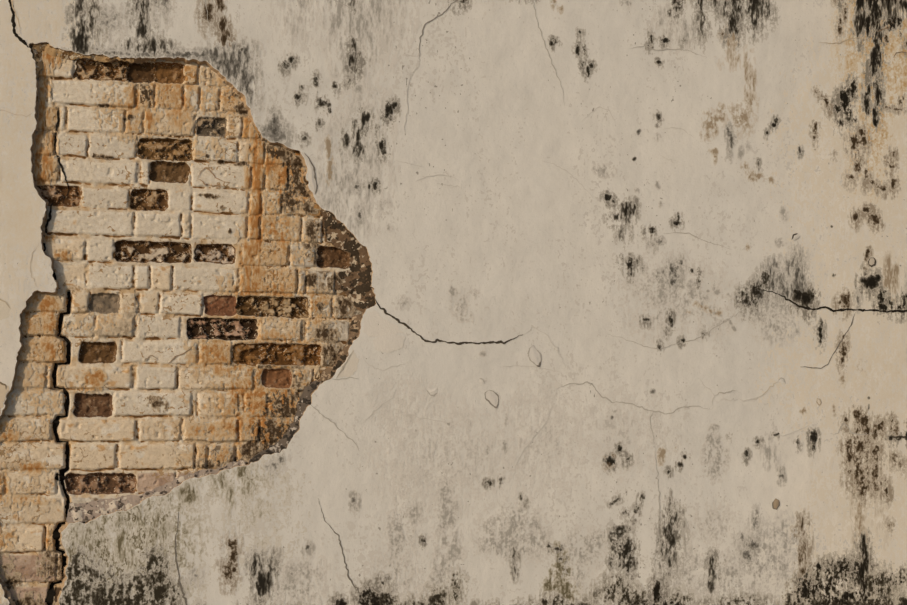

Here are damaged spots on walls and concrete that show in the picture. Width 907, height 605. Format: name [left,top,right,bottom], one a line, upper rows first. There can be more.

crack [8,0,28,47]
crack [404,0,458,130]
crack [533,1,565,106]
damp [0,0,564,343]
crack [30,84,71,605]
spalling [0,42,404,605]
damp [348,0,907,605]
crack [609,289,907,369]
crack [375,299,778,584]
crack [772,422,906,438]
damp [59,450,349,605]